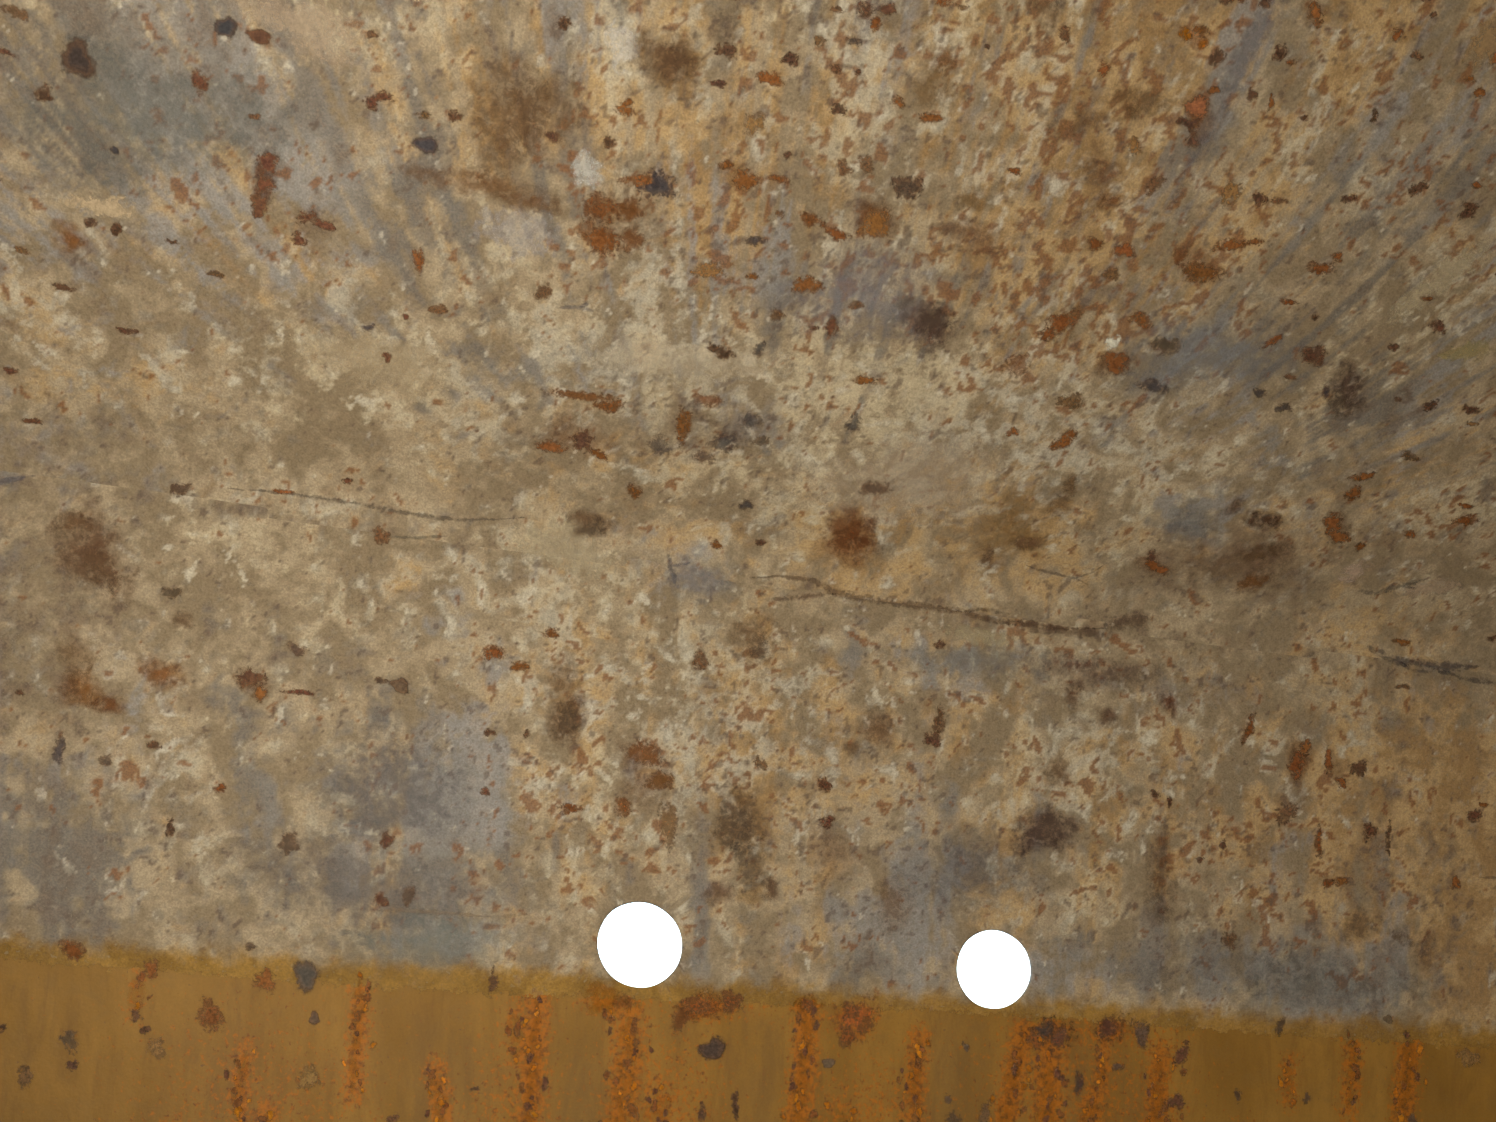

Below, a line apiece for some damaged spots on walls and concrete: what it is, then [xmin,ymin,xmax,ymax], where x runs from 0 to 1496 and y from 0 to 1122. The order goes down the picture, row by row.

rust [755,51,799,87]
rust [362,90,395,111]
rust [250,152,280,219]
rust [579,168,676,257]
rust [775,175,924,242]
rust [707,341,766,359]
rust [551,389,626,414]
rust [535,429,608,461]
rust [482,645,530,671]
rust [236,667,314,703]
rust [1286,739,1367,789]
rust [628,739,678,850]